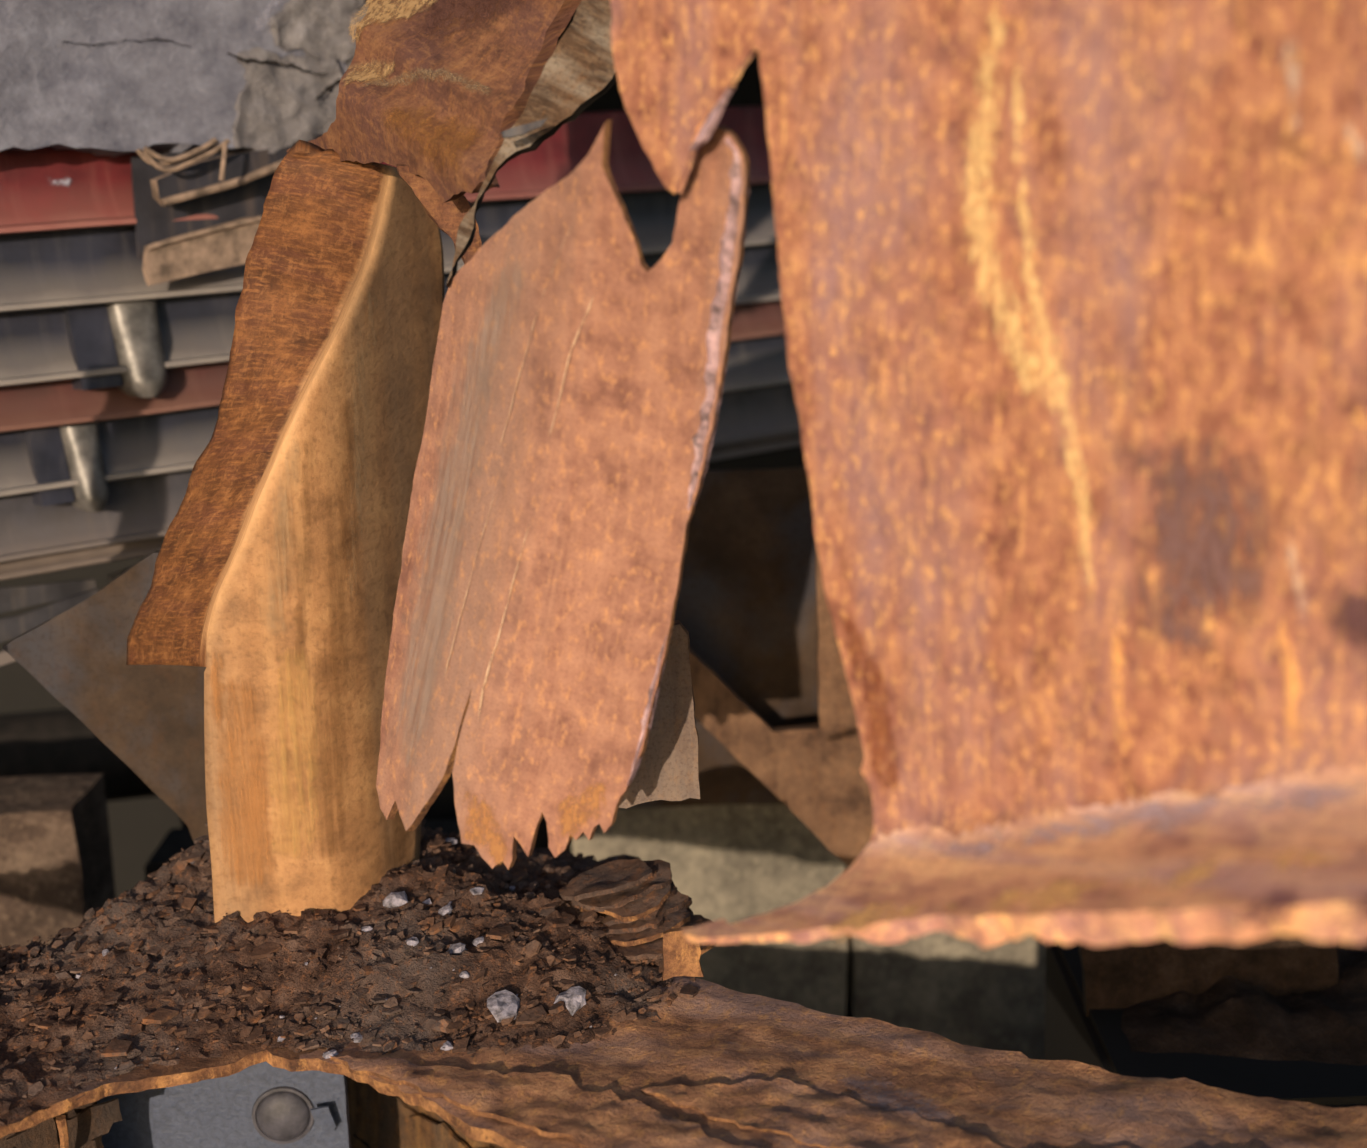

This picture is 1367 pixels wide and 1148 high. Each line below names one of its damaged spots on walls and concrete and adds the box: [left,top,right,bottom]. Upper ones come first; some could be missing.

corrosion [396,164,482,265]
corrosion [965,13,1093,582]
corrosion [1334,593,1367,644]
corrosion [559,858,712,973]
corrosion [699,944,716,955]
corrosion [1077,934,1338,1016]
corrosion [330,1055,1003,1148]